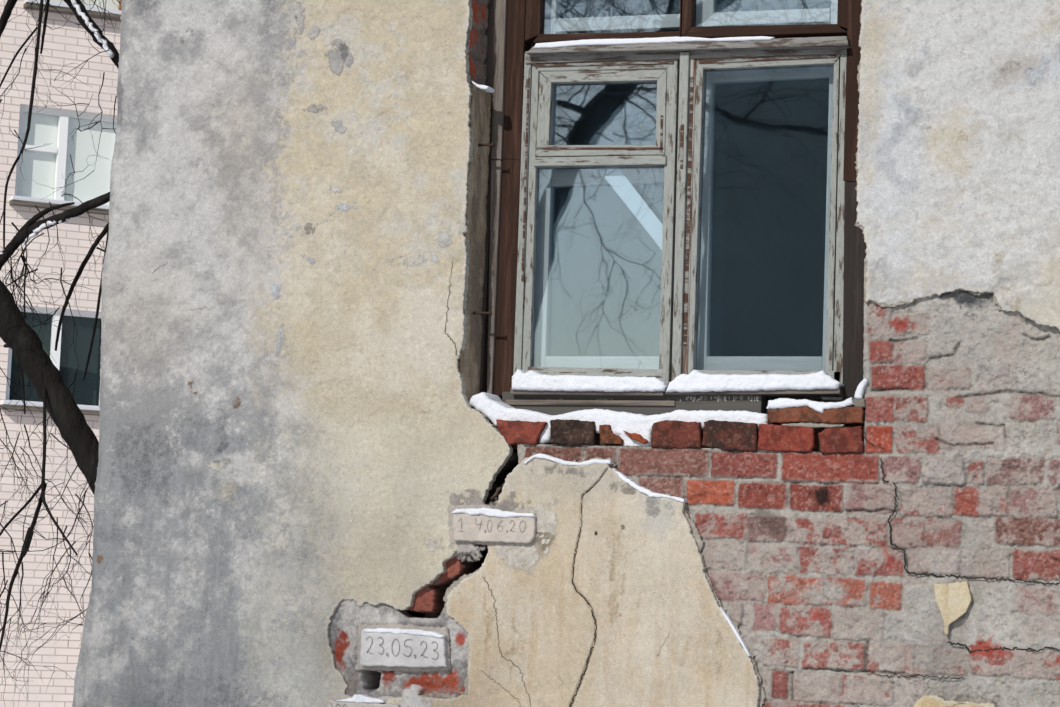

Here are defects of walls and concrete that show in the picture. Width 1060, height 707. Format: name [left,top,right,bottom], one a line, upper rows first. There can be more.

flaking render [467,0,490,88]
crack [445,262,458,356]
crack [485,449,519,505]
flaking render [489,258,1060,707]
crack [863,427,1060,585]
flaking render [329,599,469,698]
crack [406,545,531,707]
crack [569,468,608,707]
crack [867,672,966,707]
crack [947,641,1060,653]